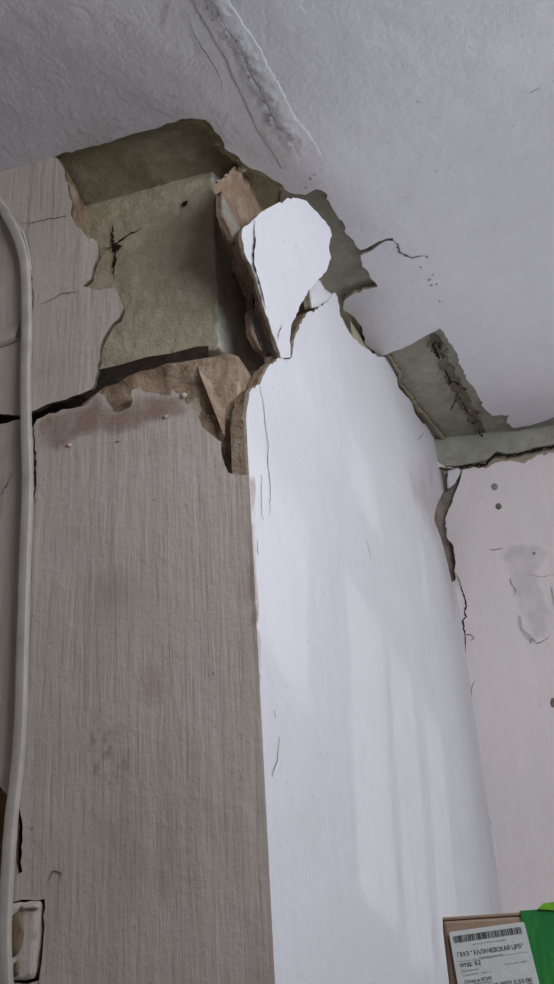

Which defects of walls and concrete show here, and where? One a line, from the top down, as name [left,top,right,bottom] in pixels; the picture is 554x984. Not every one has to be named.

spalling [58,157,88,235]
crack [31,276,71,313]
flaking render [213,163,375,364]
crack [0,395,89,501]
spalling [73,346,252,474]
spalling [440,445,554,477]
crack [434,468,475,653]
peeling [12,911,24,977]